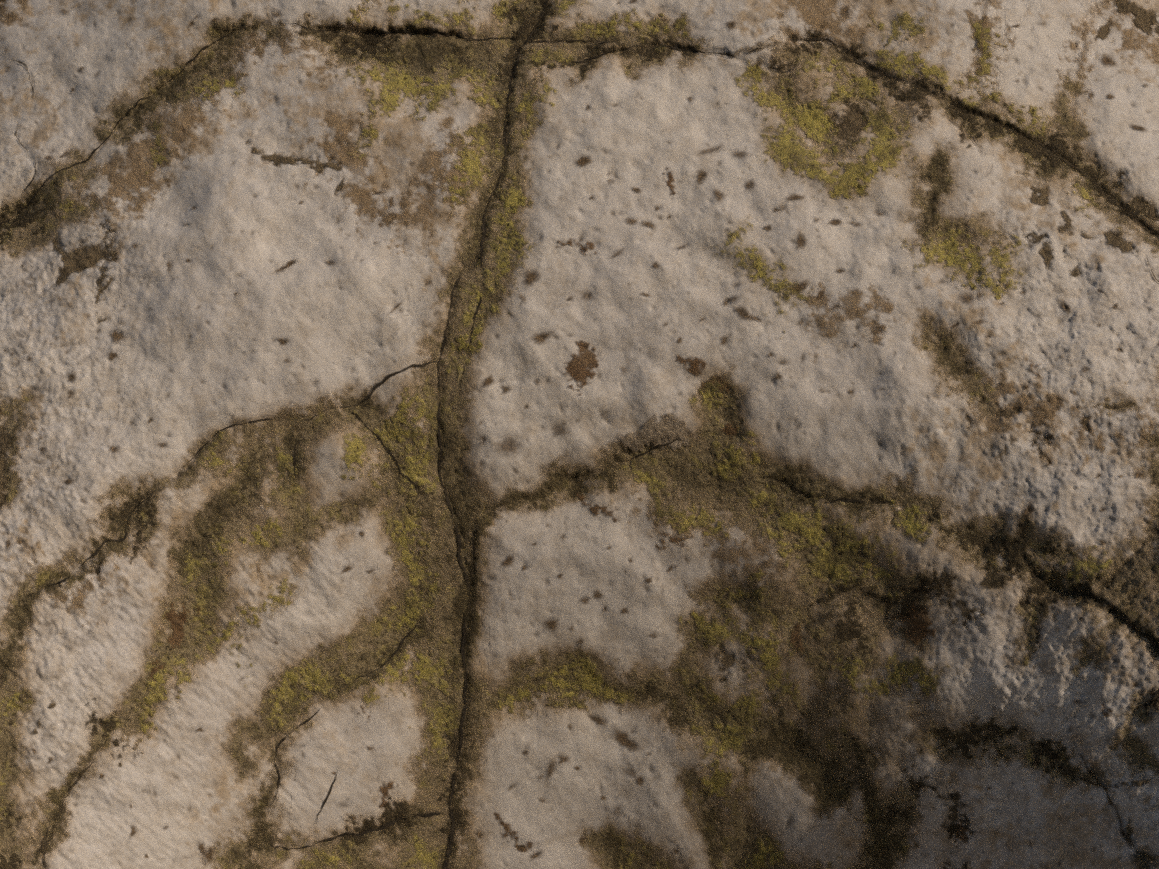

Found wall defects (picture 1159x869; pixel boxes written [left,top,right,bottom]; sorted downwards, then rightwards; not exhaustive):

crack [0,33,232,224]
water stain [77,30,330,218]
crack [1024,135,1159,282]
water stain [1117,214,1159,253]
water stain [806,284,895,343]
crack [189,0,992,869]
water stain [979,364,1104,461]
crack [27,497,149,596]
crack [1020,520,1159,652]
crack [36,735,110,868]
water stain [373,653,483,869]
water stain [676,767,731,869]